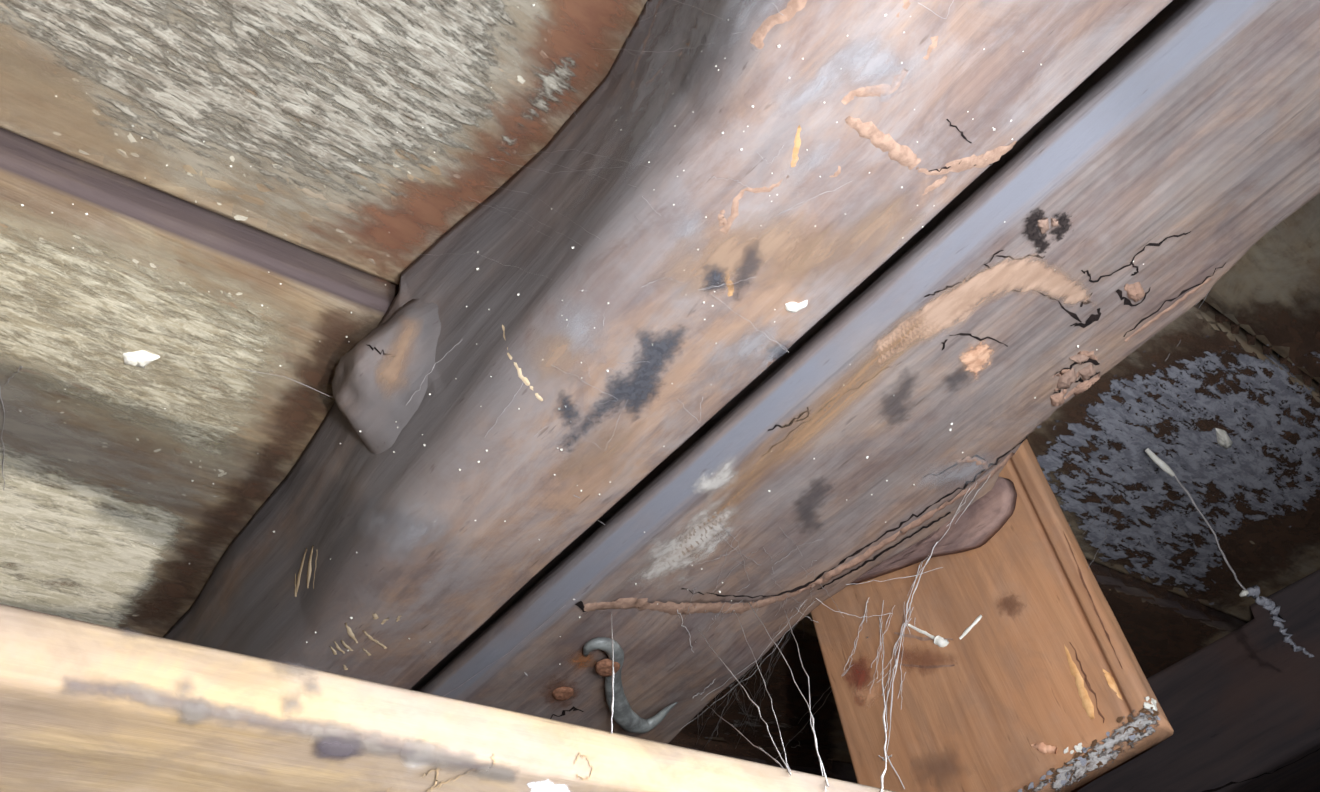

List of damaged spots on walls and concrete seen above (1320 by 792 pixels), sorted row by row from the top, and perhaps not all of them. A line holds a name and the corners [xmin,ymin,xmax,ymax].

leakage [348,0,637,272]
leakage [559,330,683,446]
leakage [705,251,759,290]
crack [924,231,1225,406]
leakage [1029,300,1320,679]